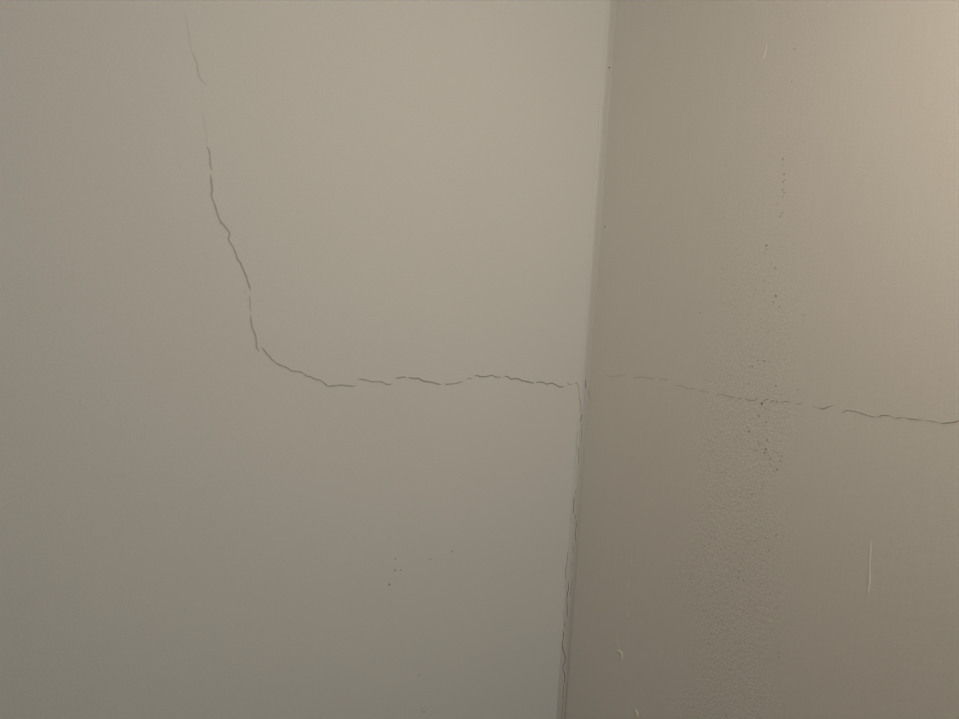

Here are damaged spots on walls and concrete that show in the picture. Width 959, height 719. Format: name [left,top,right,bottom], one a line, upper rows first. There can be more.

crack [200,111,959,719]